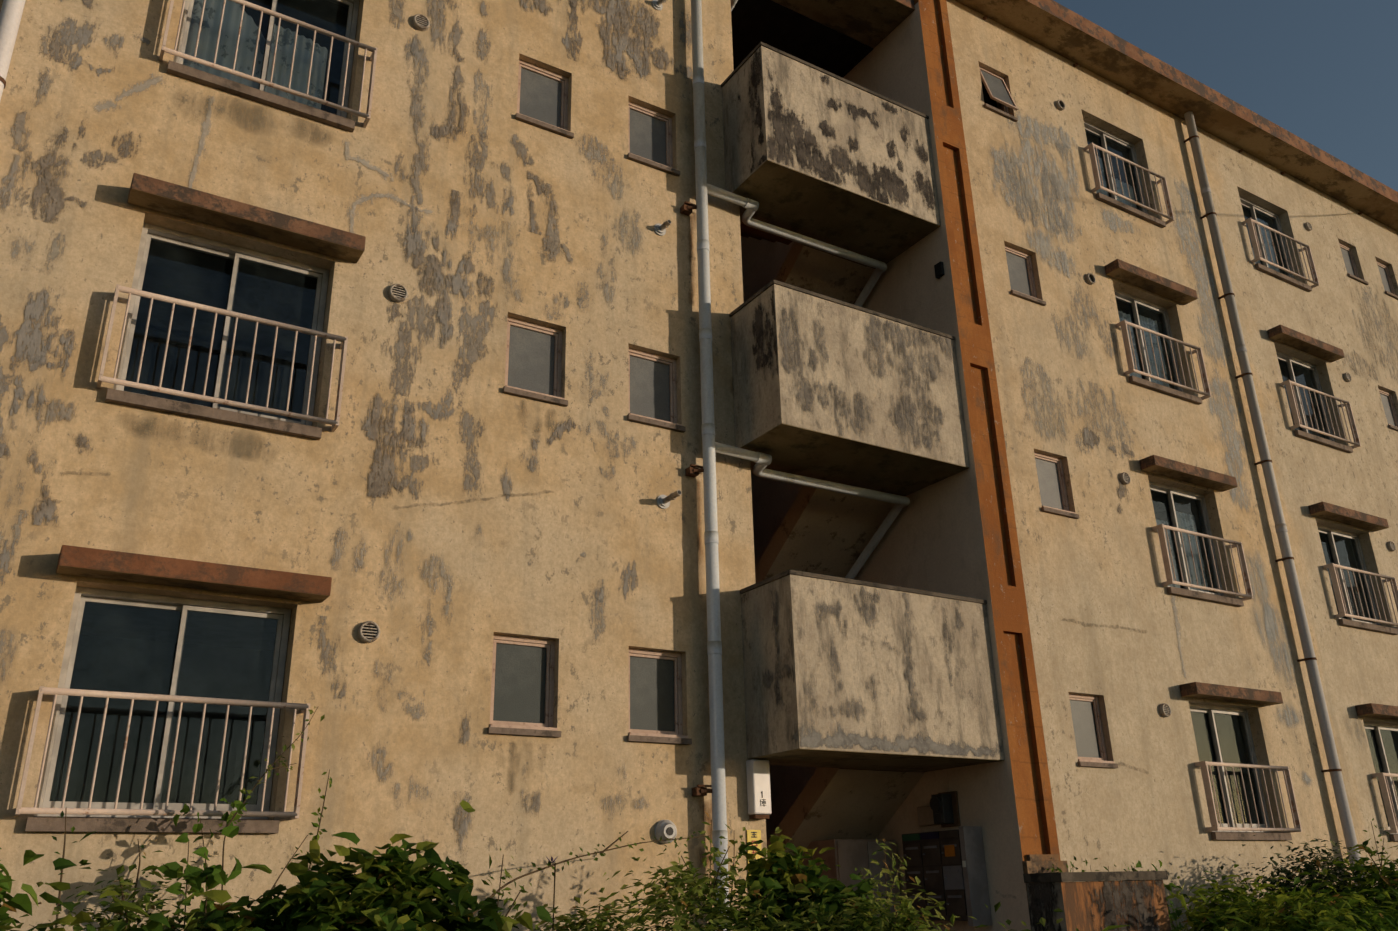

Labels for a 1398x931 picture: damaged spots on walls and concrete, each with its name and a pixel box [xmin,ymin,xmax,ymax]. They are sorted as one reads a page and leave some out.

damp [735,48,936,210]
damp [749,289,872,435]
damp [864,314,953,450]
damp [763,586,880,721]
damp [884,592,927,722]
damp [943,607,964,686]